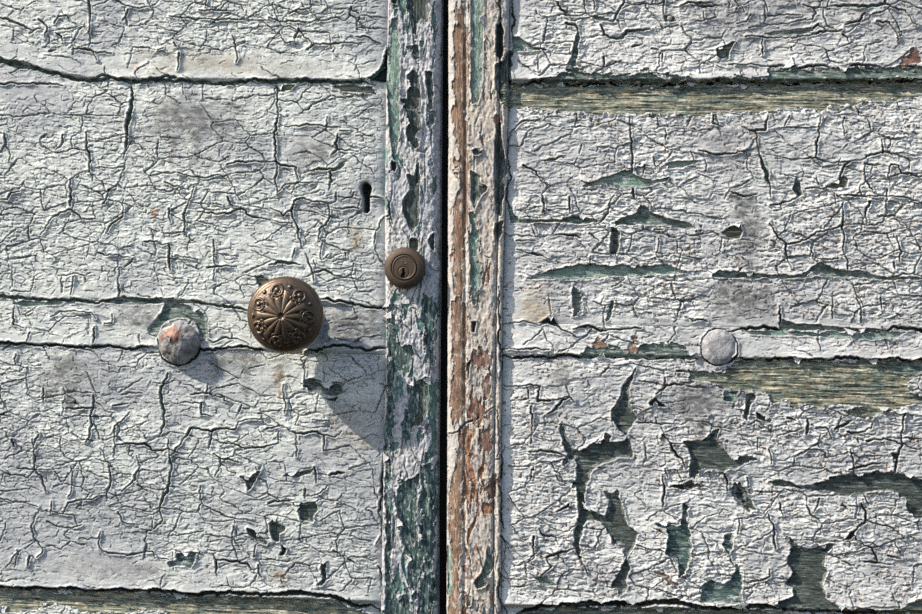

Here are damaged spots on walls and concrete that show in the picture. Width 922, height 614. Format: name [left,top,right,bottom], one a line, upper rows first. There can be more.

crack [812,0,898,36]
peeling [496,25,922,118]
crack [126,88,134,148]
crack [759,155,769,183]
corrosion [160,320,184,343]
peeling [448,0,597,614]
crack [131,314,228,525]
crack [187,408,262,448]
peeling [382,294,437,614]
peeling [560,336,696,595]
peeling [769,471,922,518]
peeling [519,534,922,614]